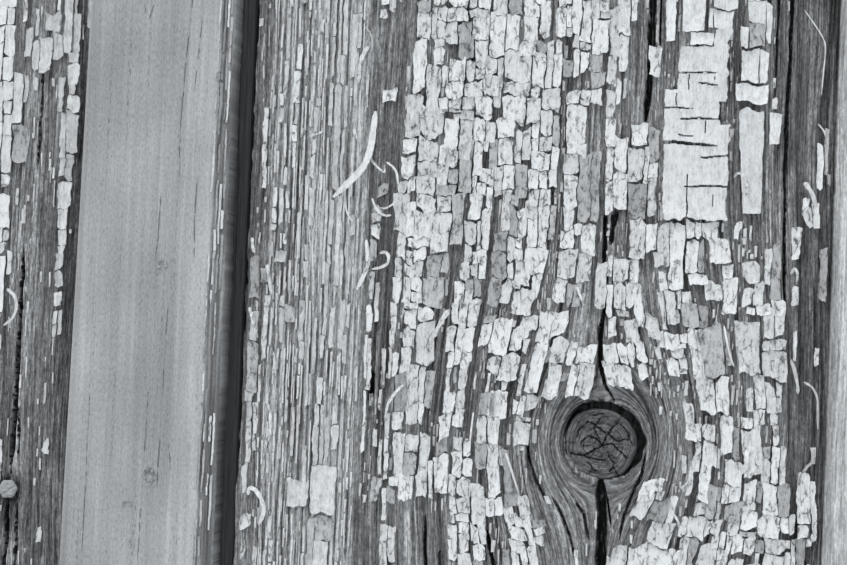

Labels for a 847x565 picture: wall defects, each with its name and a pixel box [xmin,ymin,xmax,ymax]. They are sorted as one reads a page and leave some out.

crack [2,502,19,565]
crack [9,247,25,477]
peeling [33,426,49,485]
peeling [0,0,91,362]
peeling [239,0,831,565]
crack [527,445,646,565]